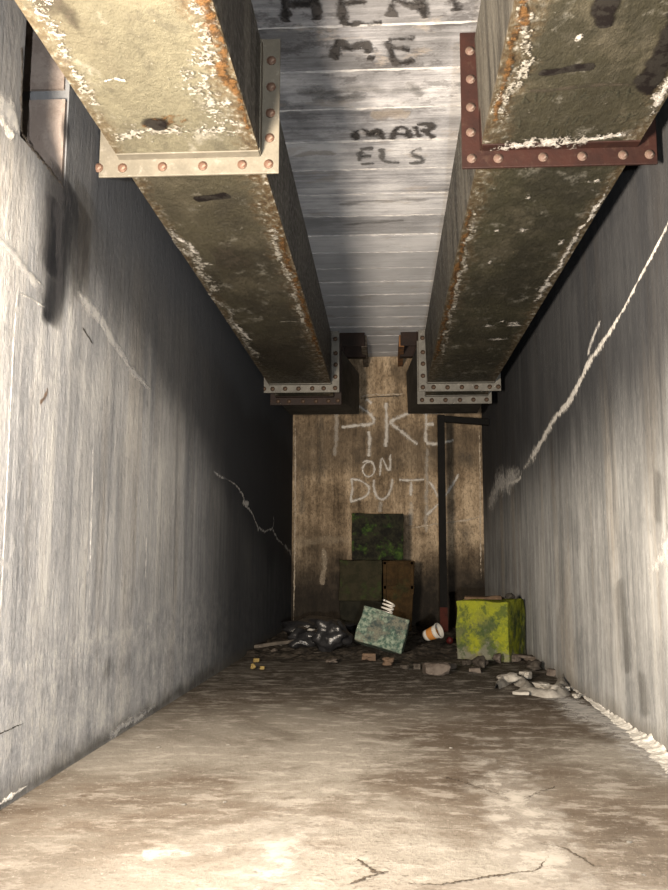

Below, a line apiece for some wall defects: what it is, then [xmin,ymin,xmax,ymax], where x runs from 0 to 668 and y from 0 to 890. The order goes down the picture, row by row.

rust [195,0,251,134]
crack [214,471,291,554]
leakage [557,684,668,774]